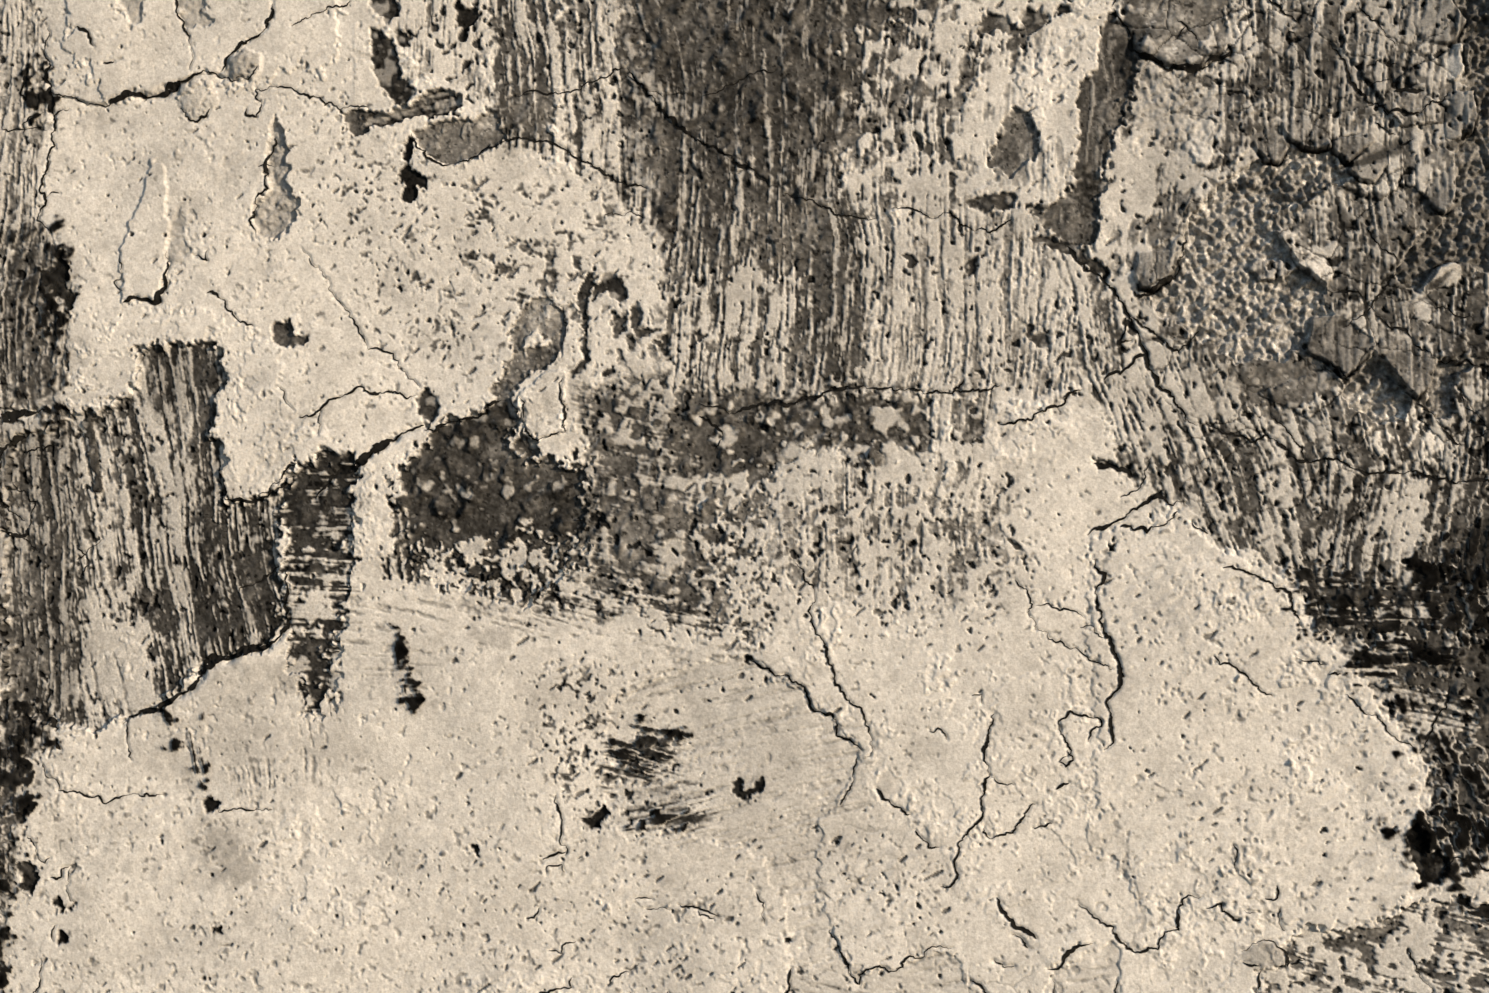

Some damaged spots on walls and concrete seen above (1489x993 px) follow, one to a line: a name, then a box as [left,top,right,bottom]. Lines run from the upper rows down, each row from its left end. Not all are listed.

peeling [0,341,366,739]
crack [2,0,367,244]
peeling [380,297,599,612]
crack [699,380,1000,449]
crack [749,458,1208,888]
peeling [967,14,1139,251]
crack [1000,229,1489,484]
spalling [1134,117,1474,425]
crack [1223,565,1452,754]
spalling [1395,0,1489,296]
crack [972,886,1303,993]
peeling [1253,894,1489,993]